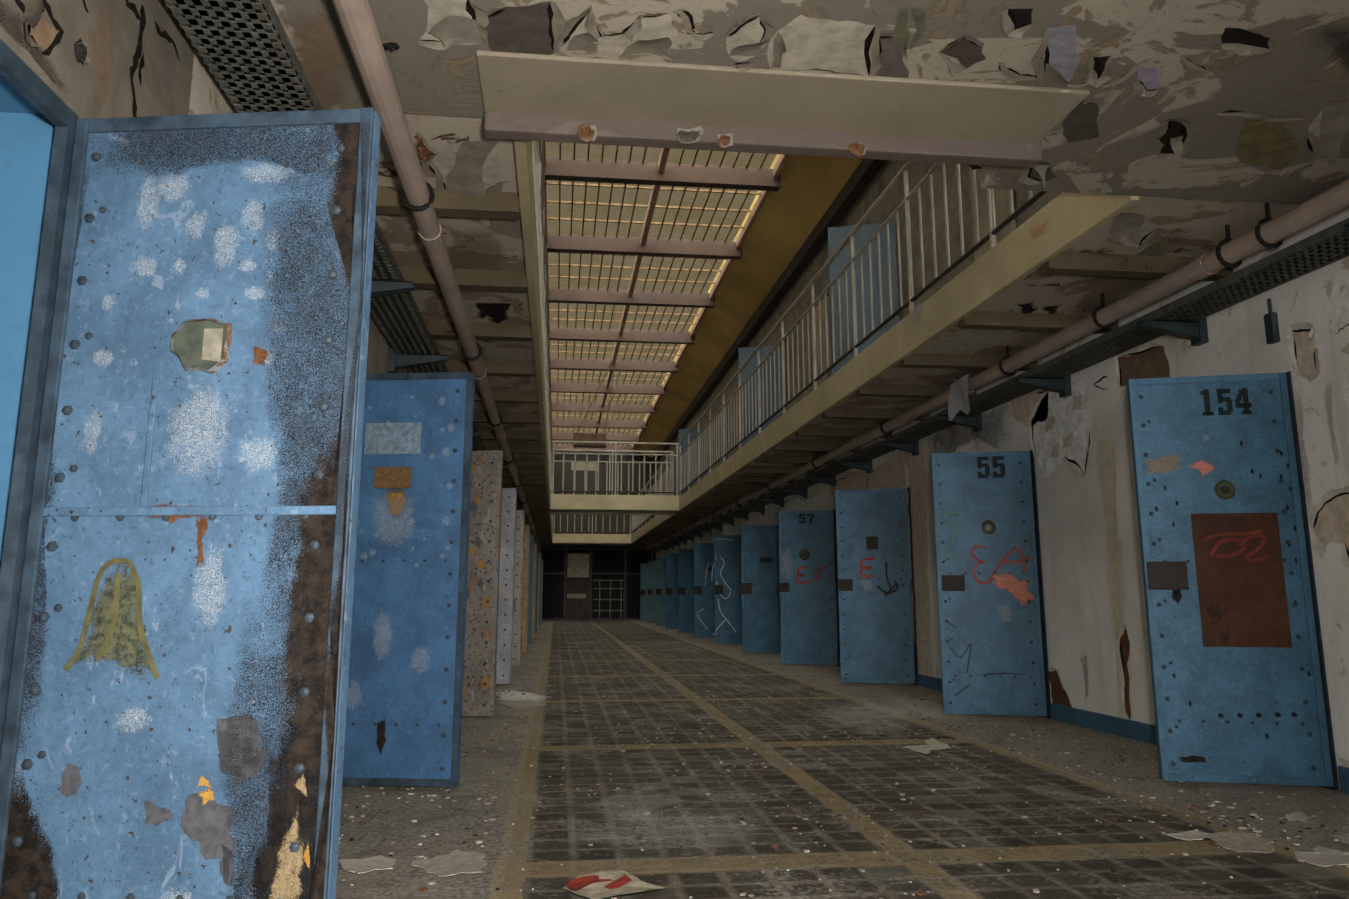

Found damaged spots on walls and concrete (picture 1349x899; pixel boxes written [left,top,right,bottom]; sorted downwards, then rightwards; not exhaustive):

crack [15,0,89,56]
crack [126,0,180,117]
peeling [939,35,986,77]
peeling [1002,8,1112,143]
peeling [1134,68,1161,97]
peeling [1221,28,1270,56]
peeling [1157,119,1194,160]
peeling [1235,101,1349,171]
peeling [1017,162,1058,188]
peeling [1114,342,1170,387]
peeling [1310,486,1349,567]